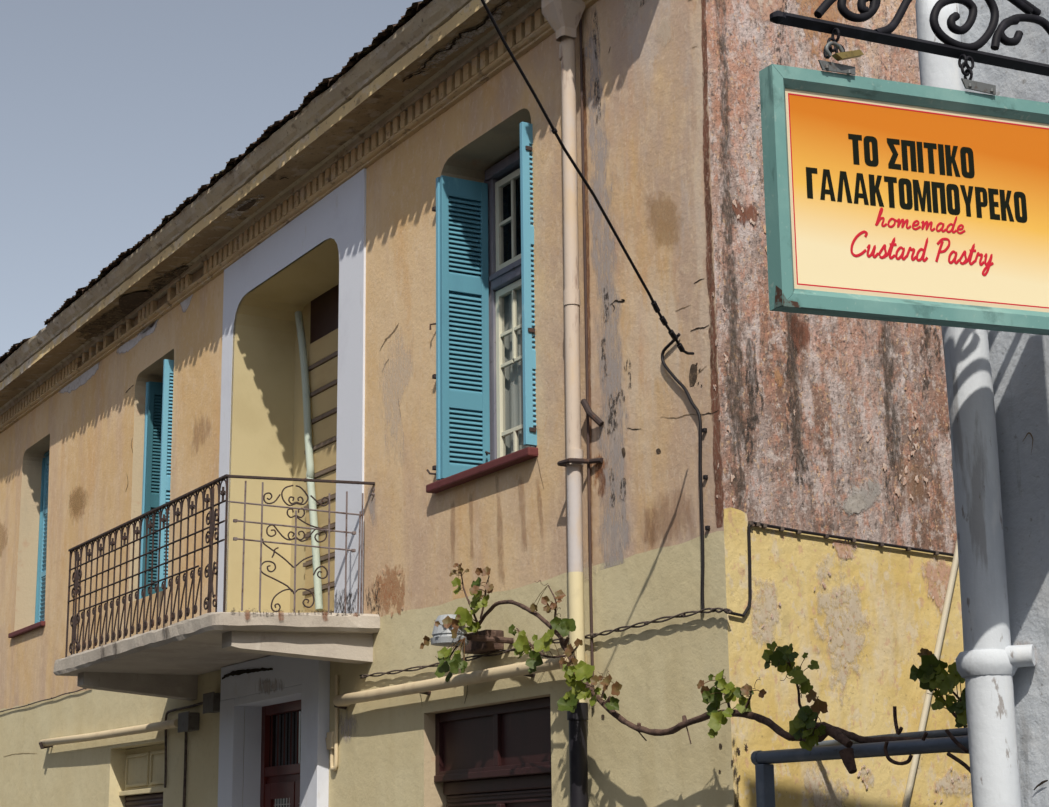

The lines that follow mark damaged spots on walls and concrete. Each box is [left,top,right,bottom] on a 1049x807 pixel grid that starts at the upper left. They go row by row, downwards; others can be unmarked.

water stain [719,35,764,507]
peeling [60,362,99,393]
peeling [117,320,158,353]
water stain [782,312,811,487]
water stain [879,321,901,521]
water stain [920,325,941,399]
peeling [374,567,405,617]
crack [222,667,273,679]